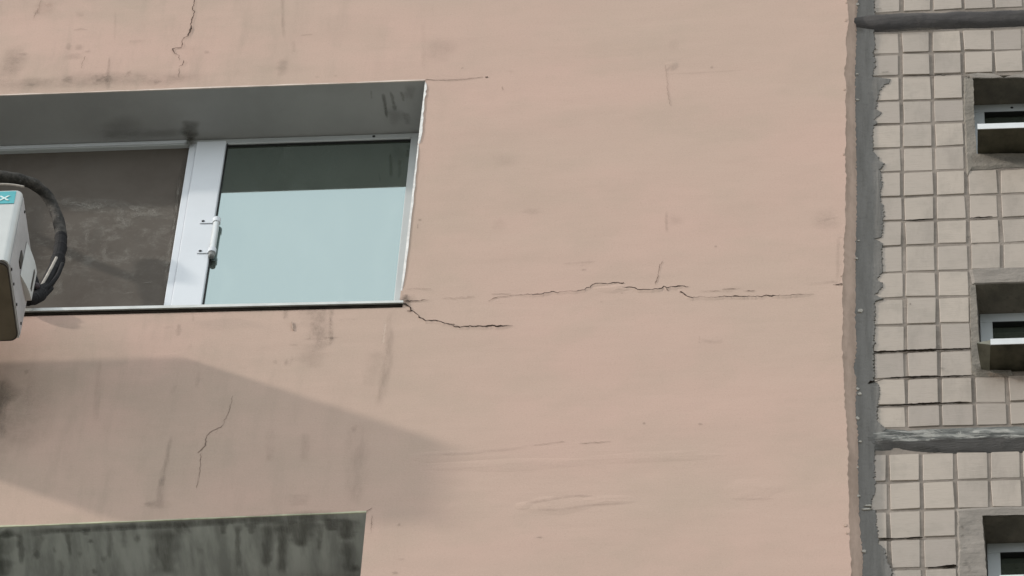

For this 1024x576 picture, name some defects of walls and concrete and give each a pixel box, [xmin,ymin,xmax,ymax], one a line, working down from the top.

crack [172,0,195,77]
crack [403,263,842,330]